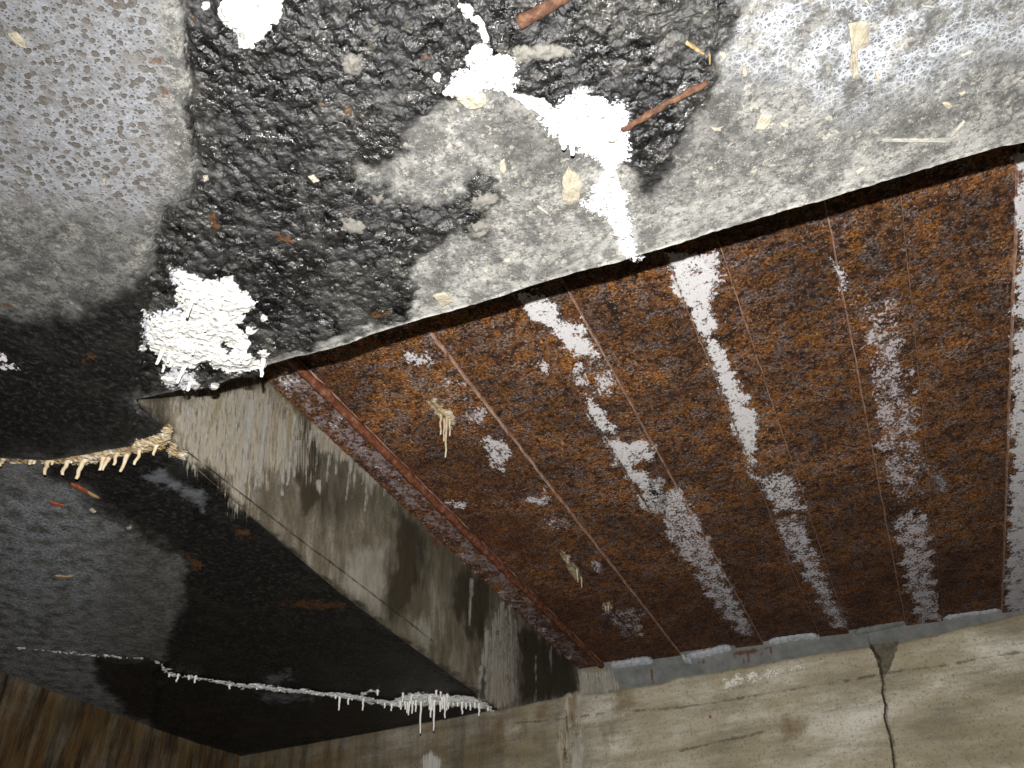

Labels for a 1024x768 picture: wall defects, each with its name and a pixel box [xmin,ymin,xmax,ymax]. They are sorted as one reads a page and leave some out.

water stain [433,3,669,262]
water stain [0,266,619,768]
crack [881,676,895,768]